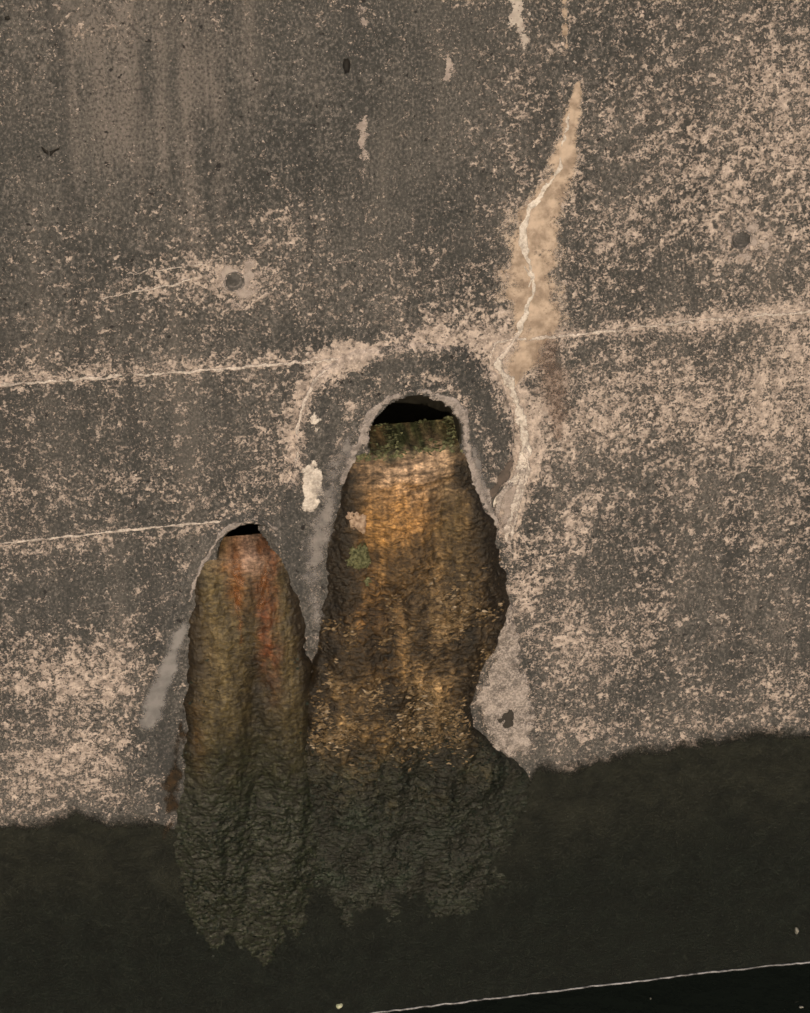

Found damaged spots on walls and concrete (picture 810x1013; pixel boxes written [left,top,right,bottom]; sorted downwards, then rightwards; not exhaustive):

water stain [295,365,336,436]
crack [490,113,570,567]
water stain [496,82,583,386]
water stain [0,416,810,1013]